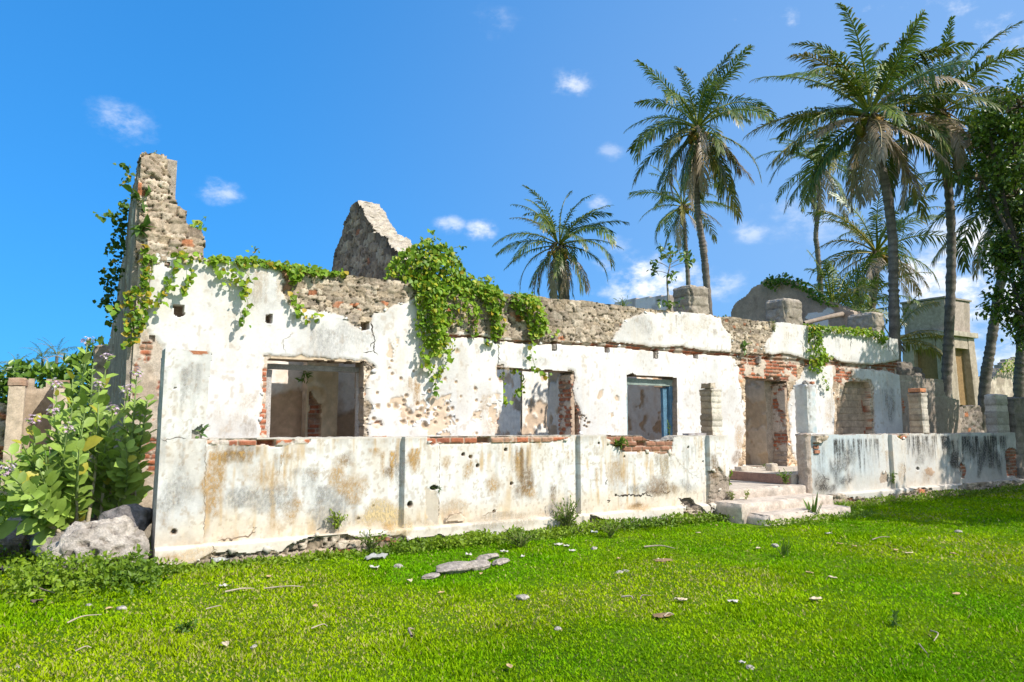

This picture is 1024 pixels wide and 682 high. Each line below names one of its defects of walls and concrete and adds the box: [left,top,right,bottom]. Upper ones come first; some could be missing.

spalling [281,270,675,347]
crack [361,324,376,370]
spalling [207,338,590,447]
spalling [706,314,806,466]
peeling [813,360,877,453]
spalling [606,435,673,456]
water stain [632,477,669,494]
water stain [815,439,878,490]
water stain [909,436,1008,473]
water stain [362,500,412,535]
spalling [168,532,469,568]